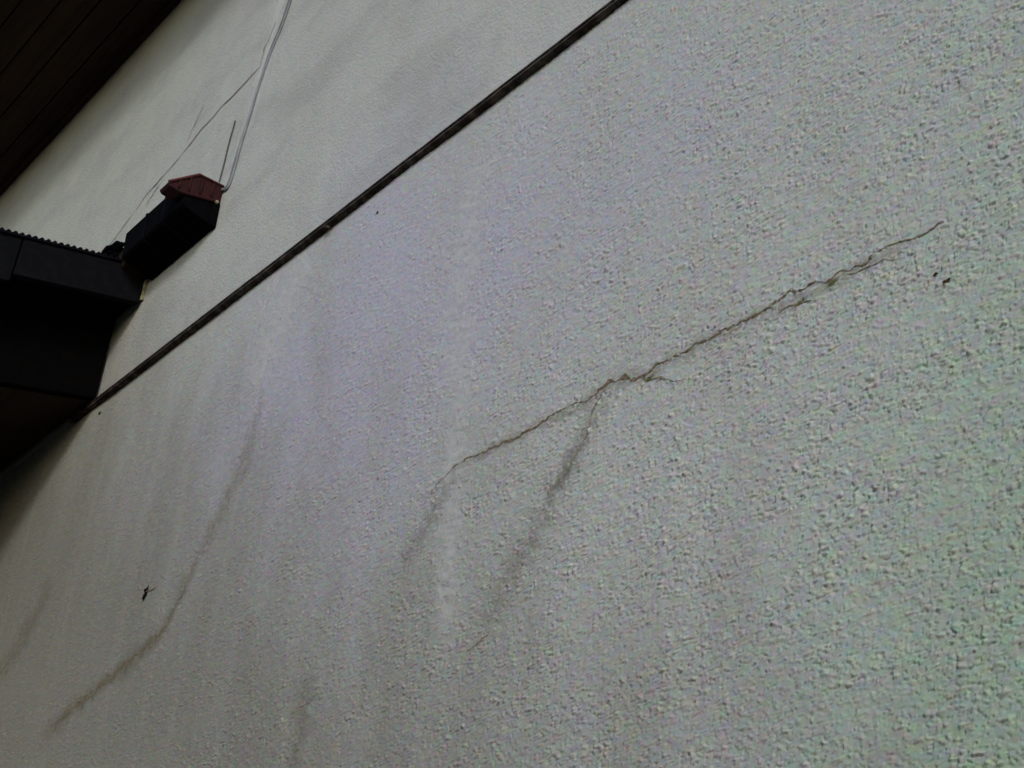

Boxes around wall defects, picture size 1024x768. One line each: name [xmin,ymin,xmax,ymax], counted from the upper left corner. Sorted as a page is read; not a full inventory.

crack [423,221,943,505]